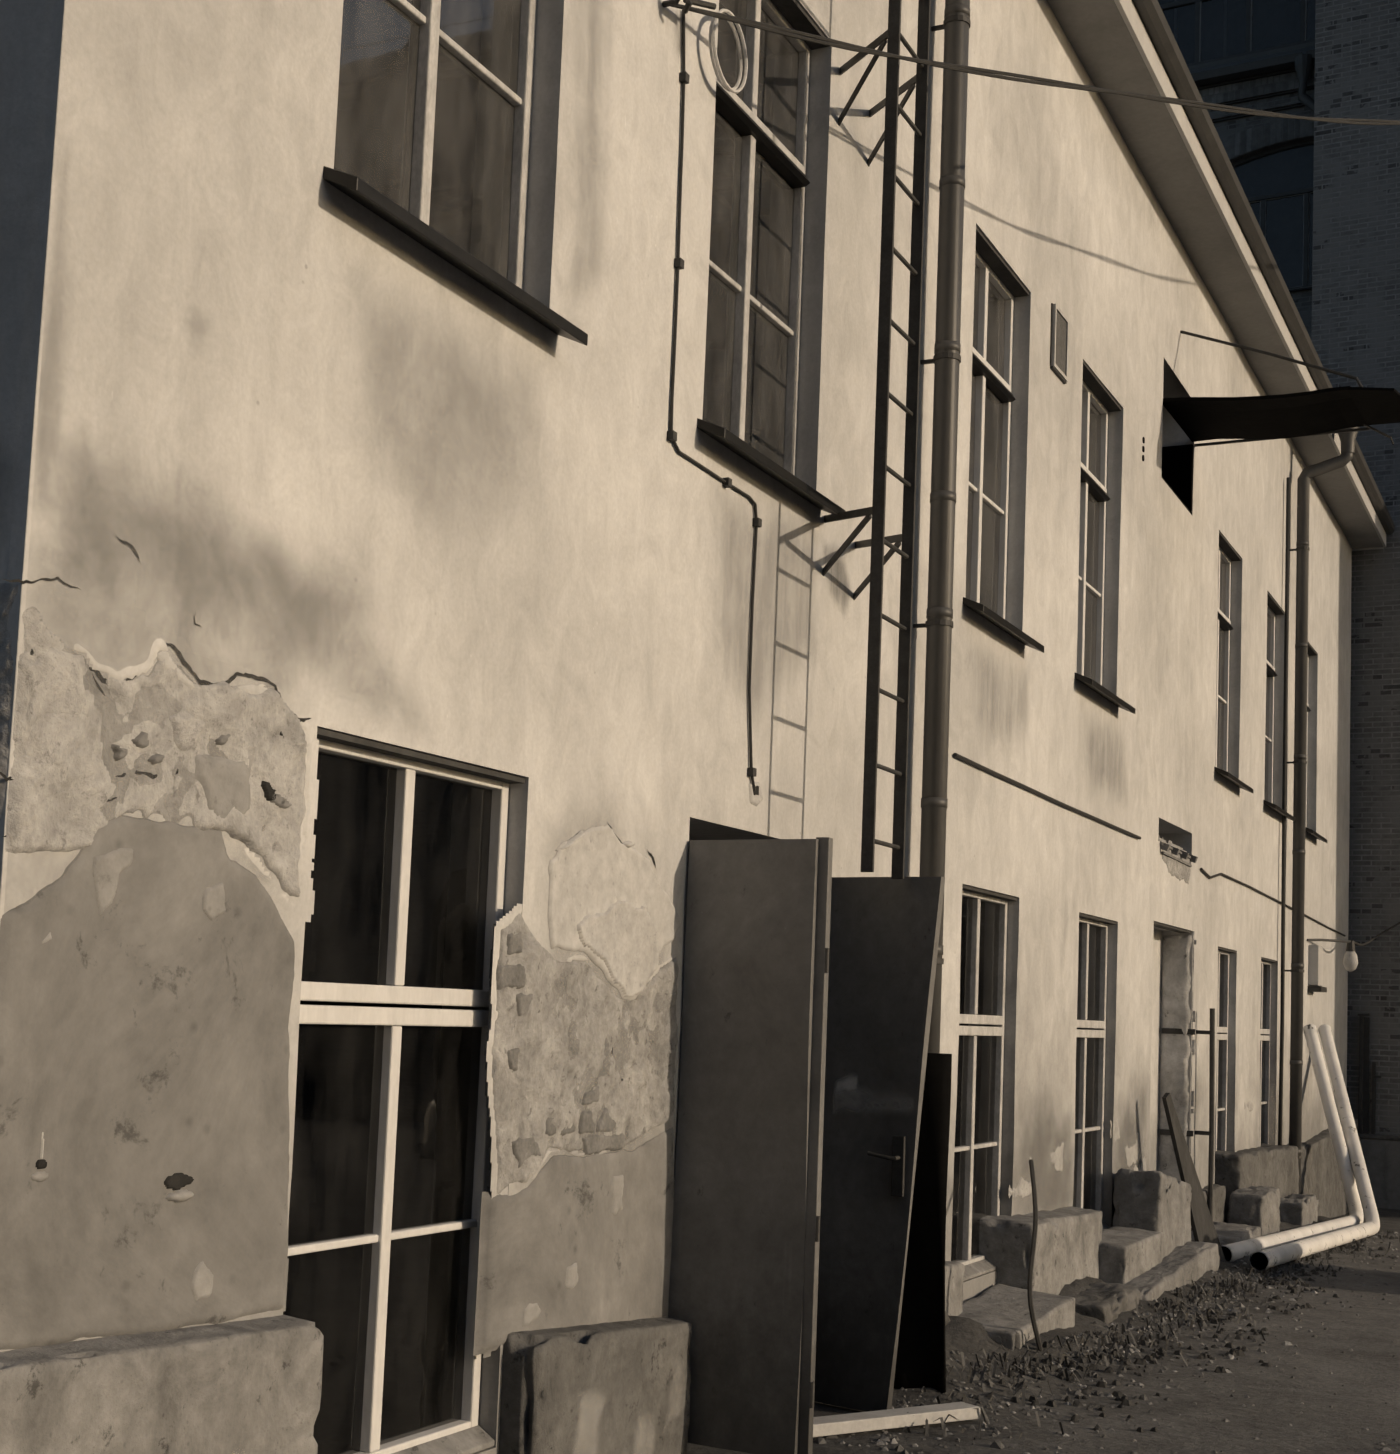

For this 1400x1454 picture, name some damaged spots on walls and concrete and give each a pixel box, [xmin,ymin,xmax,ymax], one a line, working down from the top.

crack [3,576,81,590]
spalling [0,583,319,922]
spalling [31,1132,48,1182]
spalling [484,824,681,1199]